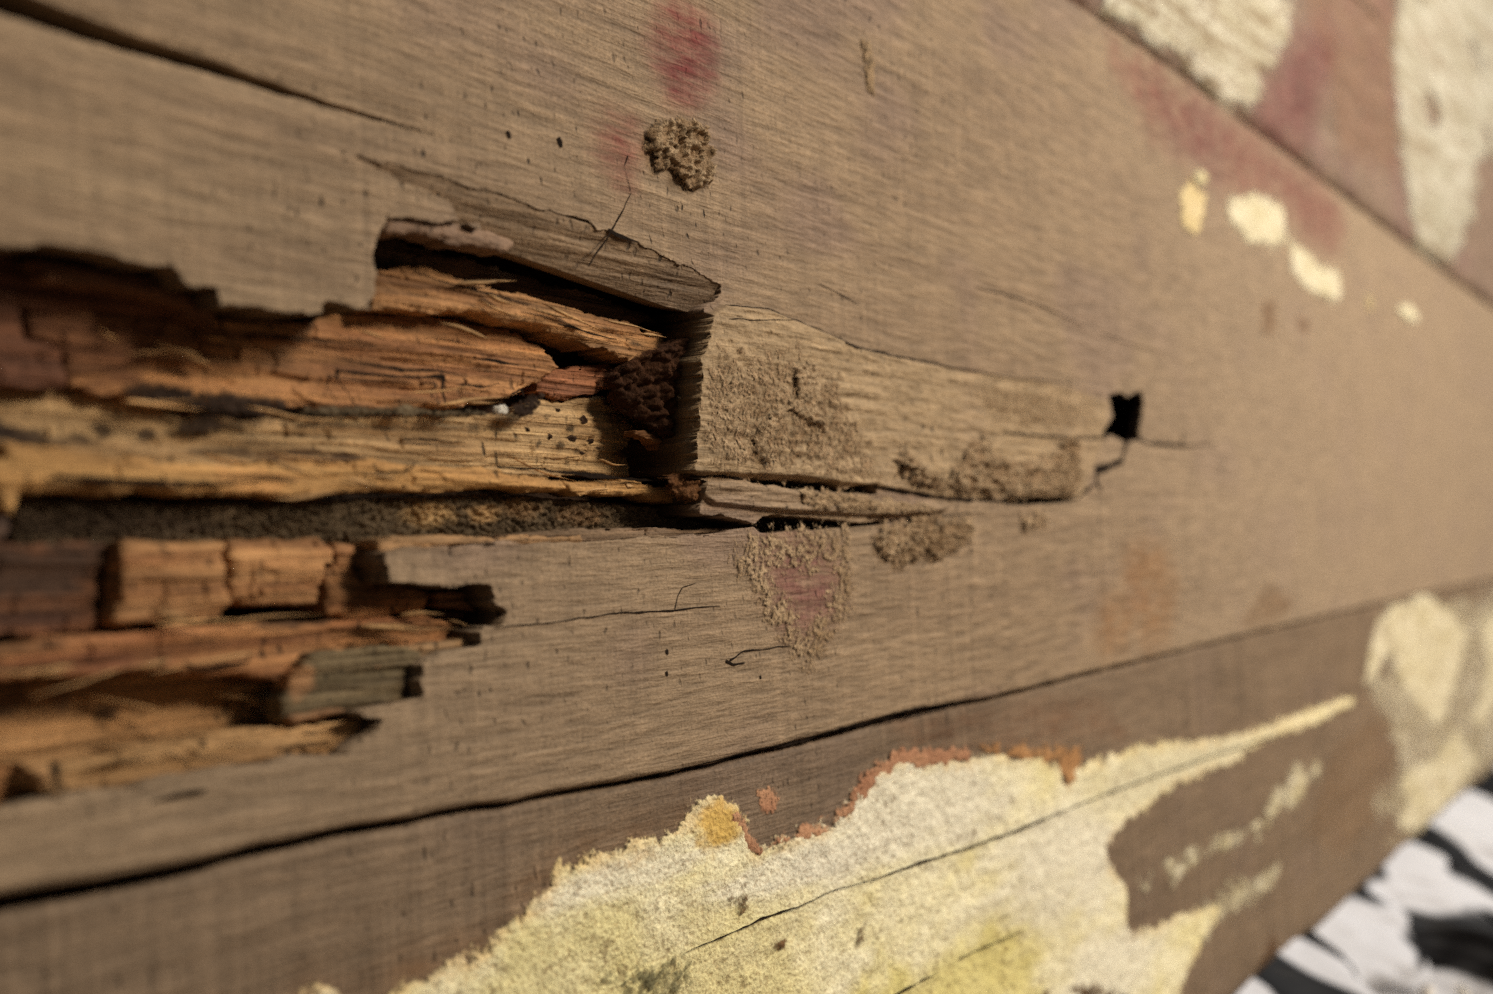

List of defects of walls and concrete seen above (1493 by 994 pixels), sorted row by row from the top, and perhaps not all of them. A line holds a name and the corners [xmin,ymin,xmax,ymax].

spalling [0,155,739,803]
crack [689,432,1215,532]
crack [686,733,1283,953]
crack [896,930,1023,994]